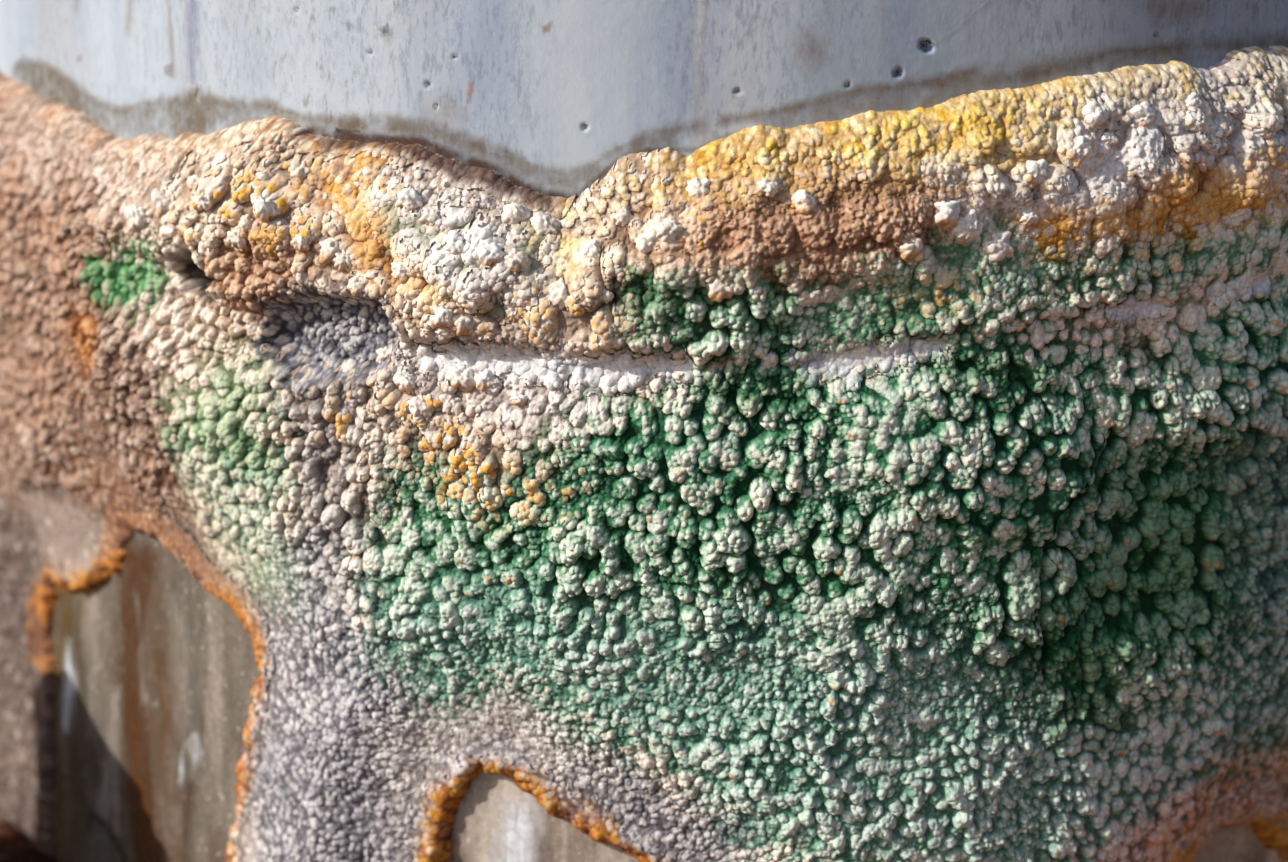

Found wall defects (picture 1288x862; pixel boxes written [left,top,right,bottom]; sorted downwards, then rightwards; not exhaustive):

leakage [1024,136,1034,156]
leakage [928,162,942,179]
leakage [1231,177,1245,192]
leakage [425,230,467,257]
leakage [463,270,488,284]
leakage [476,242,531,306]
leakage [258,390,272,408]
leakage [322,385,353,447]
leakage [308,428,327,449]
peeling [52,531,261,862]
peeling [448,771,638,862]
peeling [1192,824,1280,862]